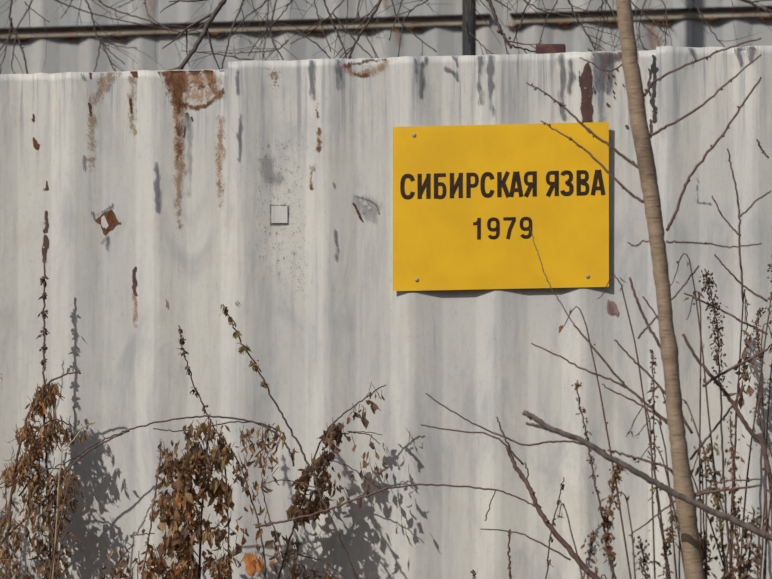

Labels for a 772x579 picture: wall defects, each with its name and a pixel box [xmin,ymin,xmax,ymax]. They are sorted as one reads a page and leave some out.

corrosion [343,59,386,78]
corrosion [88,72,115,146]
corrosion [158,70,224,215]